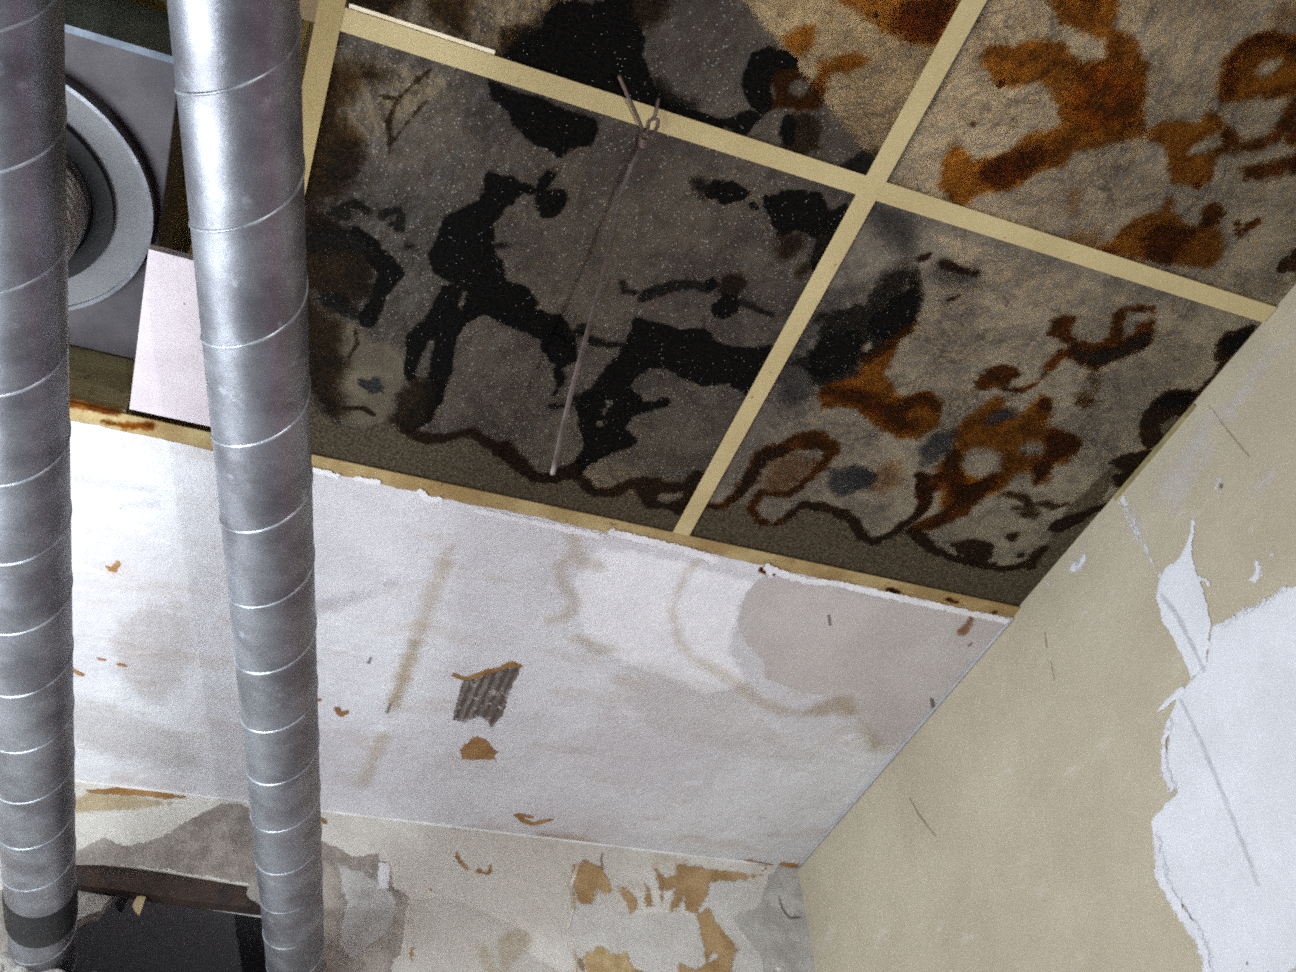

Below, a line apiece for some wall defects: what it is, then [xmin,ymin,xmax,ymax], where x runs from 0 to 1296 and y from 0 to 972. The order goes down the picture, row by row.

water stain [346,0,402,15]
water stain [502,0,825,156]
water stain [841,147,880,175]
water stain [690,178,848,279]
water stain [305,63,775,532]
water stain [780,253,979,404]
water stain [690,325,1257,606]
peeling [451,661,523,760]
peeling [132,896,146,916]
flaking render [76,803,260,905]
flaking render [322,841,415,972]
flaking render [571,860,816,972]